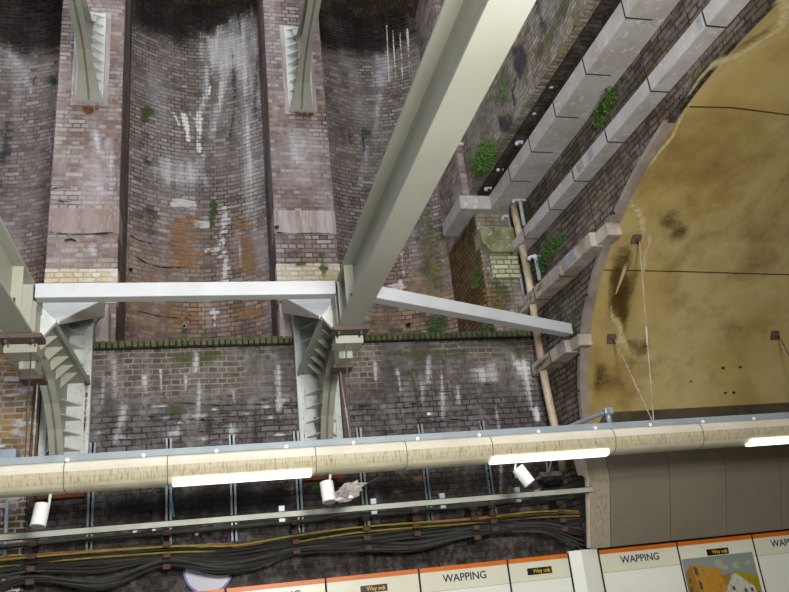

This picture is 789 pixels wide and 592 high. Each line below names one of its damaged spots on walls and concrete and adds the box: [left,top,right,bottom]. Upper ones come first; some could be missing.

leakage [512,44,528,105]
leakage [0,121,12,166]
leakage [145,156,206,184]
leakage [171,19,259,282]
leakage [498,113,512,133]
leakage [610,252,647,358]
leakage [513,357,546,421]